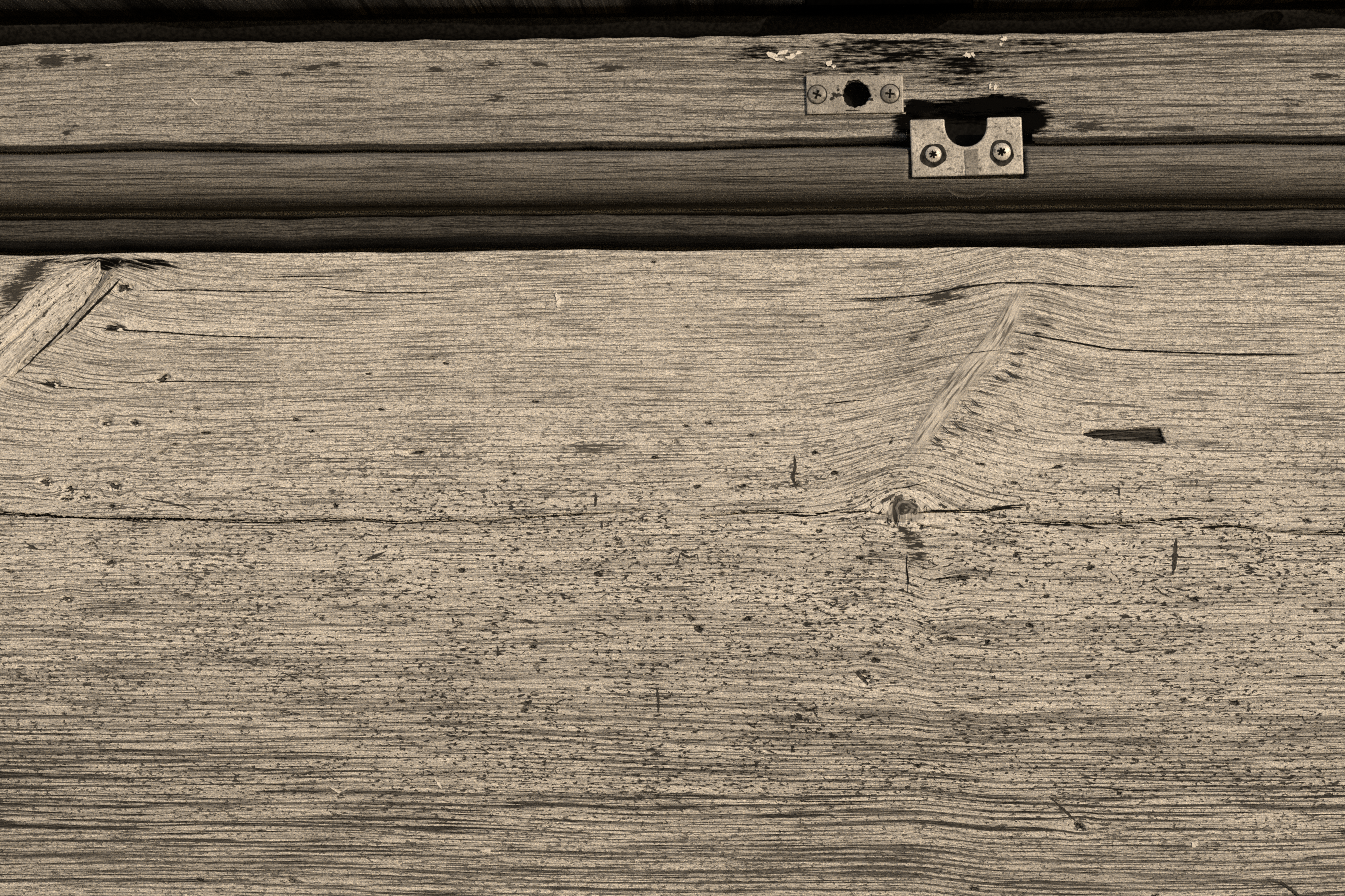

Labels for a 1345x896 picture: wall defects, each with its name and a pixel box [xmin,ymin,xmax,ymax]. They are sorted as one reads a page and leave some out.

crack [855,282,1134,299]
crack [931,324,1345,446]
crack [0,481,1345,535]
crack [906,558,965,584]